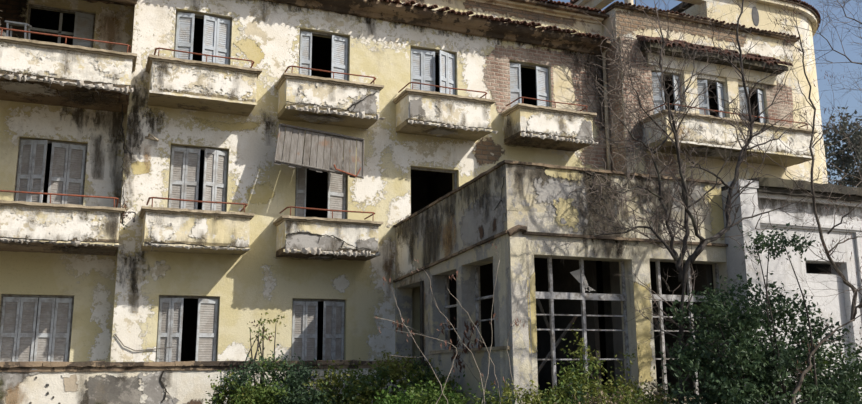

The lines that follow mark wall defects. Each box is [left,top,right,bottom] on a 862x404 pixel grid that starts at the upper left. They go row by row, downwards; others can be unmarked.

damp [51,212,150,313]
damp [44,76,164,201]
flaking render [0,0,607,362]
damp [385,164,678,286]
flaking render [606,8,793,172]
flaking render [681,82,815,158]
flaking render [0,369,39,404]
flaking render [62,370,180,404]
crack [159,370,170,403]